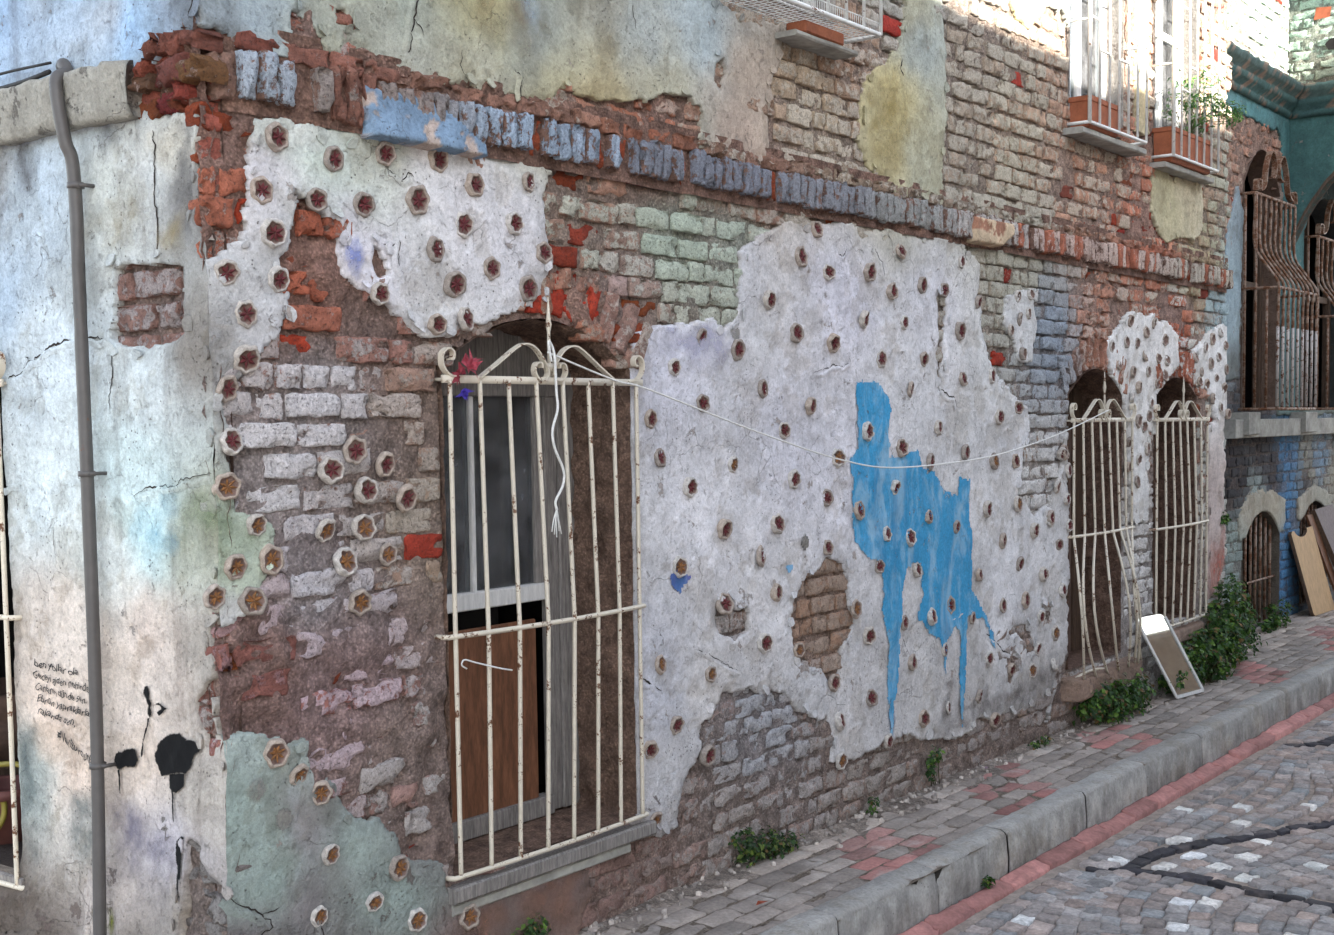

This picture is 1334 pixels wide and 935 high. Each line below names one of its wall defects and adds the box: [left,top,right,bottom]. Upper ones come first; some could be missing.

crack [147,130,158,251]
spalling [127,16,299,270]
crack [401,0,423,63]
spalling [544,80,706,140]
spalling [711,0,907,175]
spalling [920,0,1290,263]
spalling [104,249,193,359]
crack [133,473,213,505]
spalling [196,169,834,888]
spalling [961,244,1334,670]
spalling [579,422,1169,931]
spalling [161,817,252,935]